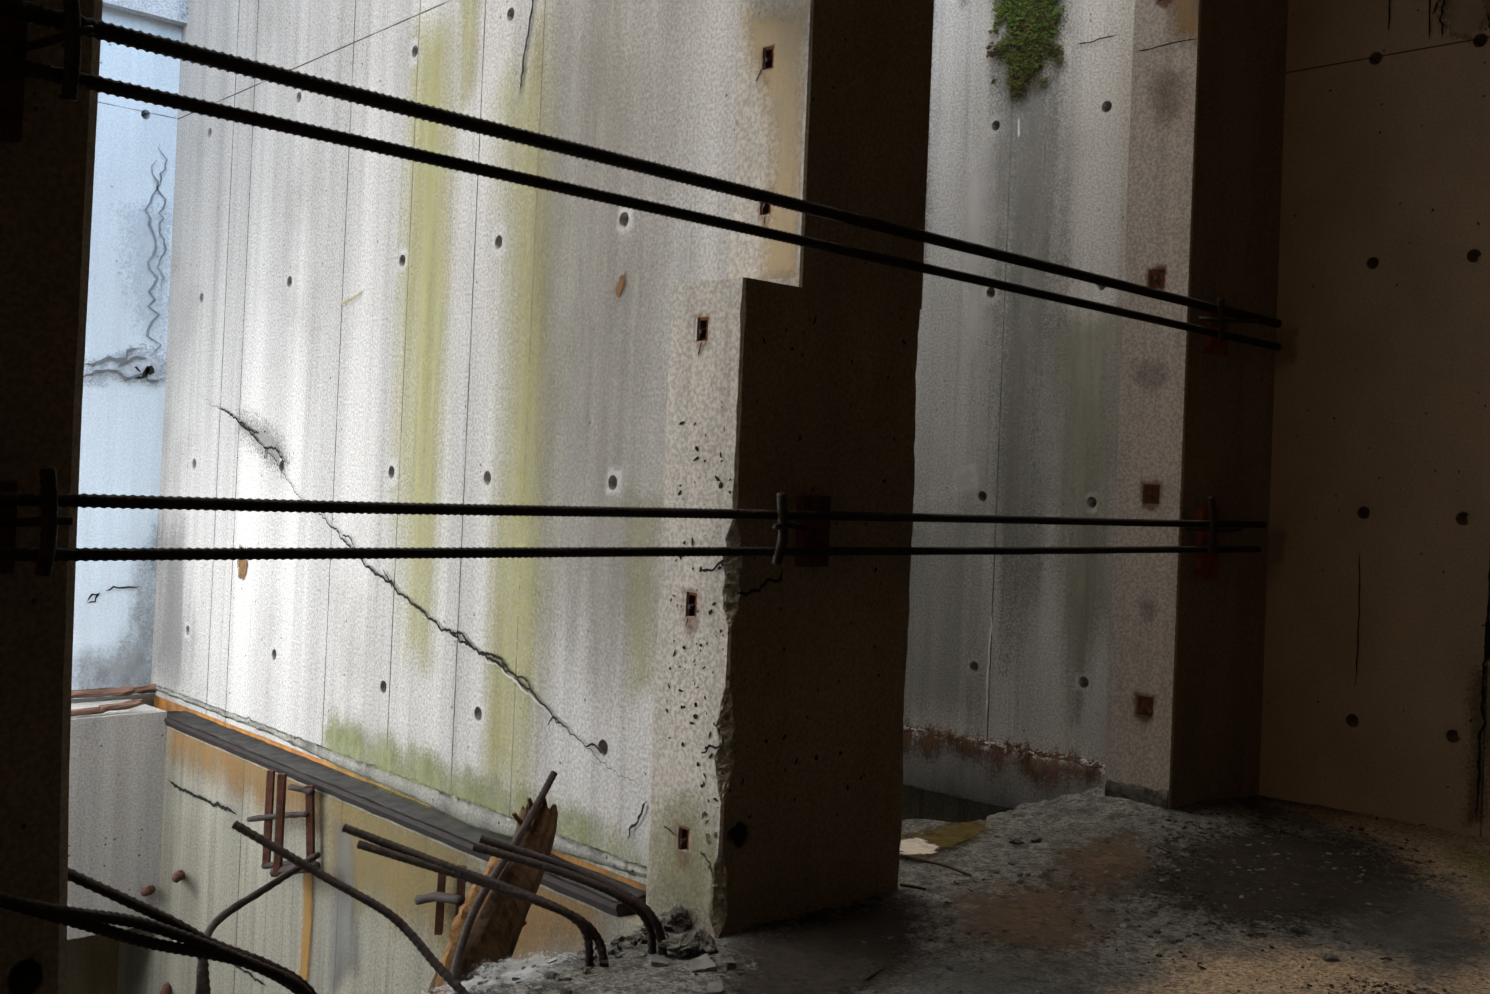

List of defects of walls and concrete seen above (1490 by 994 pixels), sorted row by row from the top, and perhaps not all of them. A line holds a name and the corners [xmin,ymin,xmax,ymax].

crack [520,0,534,90]
crack [145,144,168,354]
rust [298,873,313,980]
rust [173,730,469,939]
crack [201,395,647,838]
peeling [706,957,735,994]
spalling [666,520,787,937]
rust [903,720,1102,795]
crack [1475,558,1490,822]